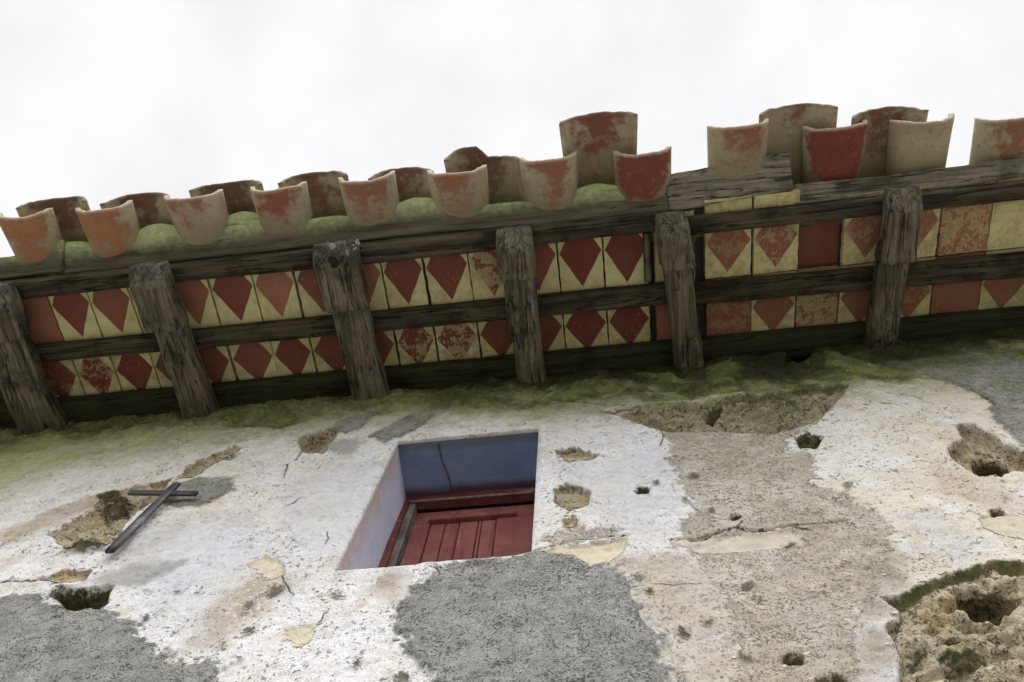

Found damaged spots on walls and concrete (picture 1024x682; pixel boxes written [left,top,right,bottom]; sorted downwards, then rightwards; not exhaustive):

spalling [298,427,339,454]
crack [437,444,453,494]
spalling [555,446,605,462]
spalling [36,444,244,583]
peeling [540,482,629,565]
crack [704,520,836,541]
peeling [605,381,1024,682]